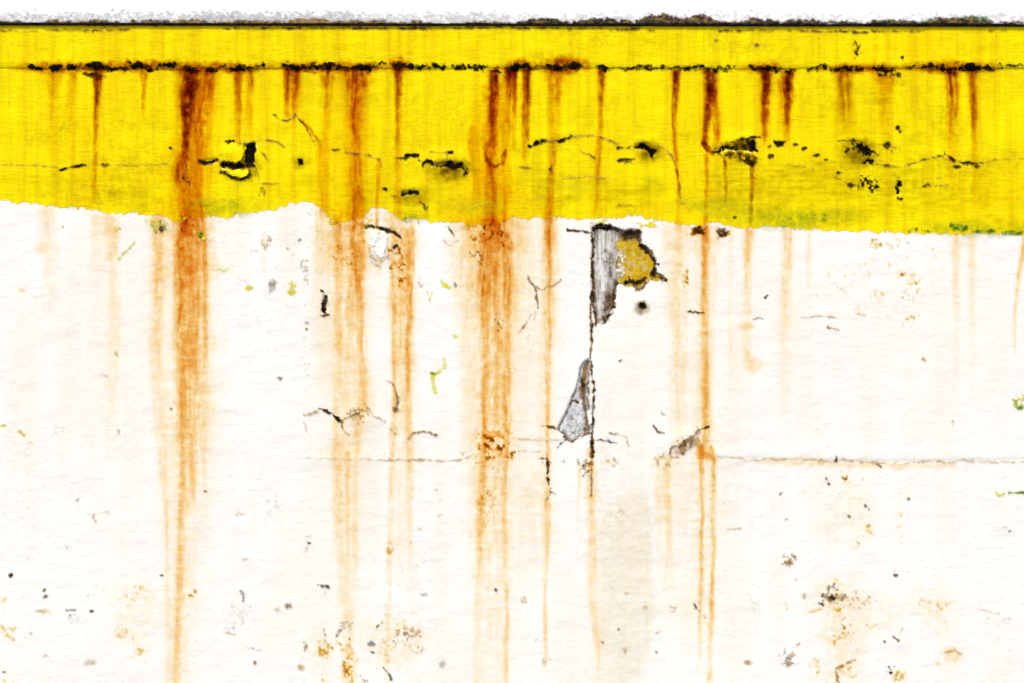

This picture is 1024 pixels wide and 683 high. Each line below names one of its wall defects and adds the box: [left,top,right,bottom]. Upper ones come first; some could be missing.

rust [175,67,215,203]
rust [393,65,403,138]
rust [470,66,532,246]
rust [701,68,719,158]
rust [760,68,794,137]
rust [947,70,977,129]
rust [690,218,730,237]
peeling [589,223,667,326]
crack [303,381,437,461]
rust [476,434,515,463]
peeling [558,359,592,443]
crack [541,300,616,496]